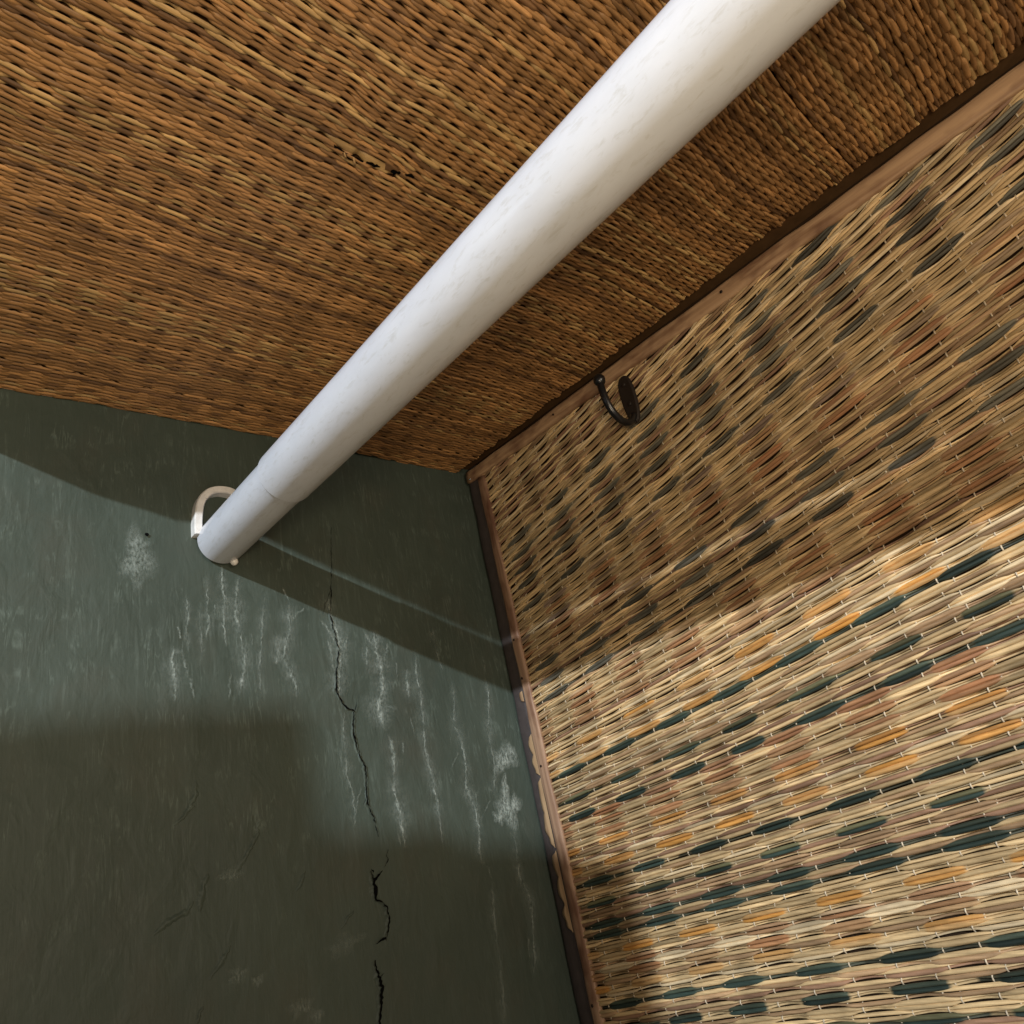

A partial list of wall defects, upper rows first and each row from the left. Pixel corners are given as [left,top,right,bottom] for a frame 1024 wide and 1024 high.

crack [323,528,391,1024]